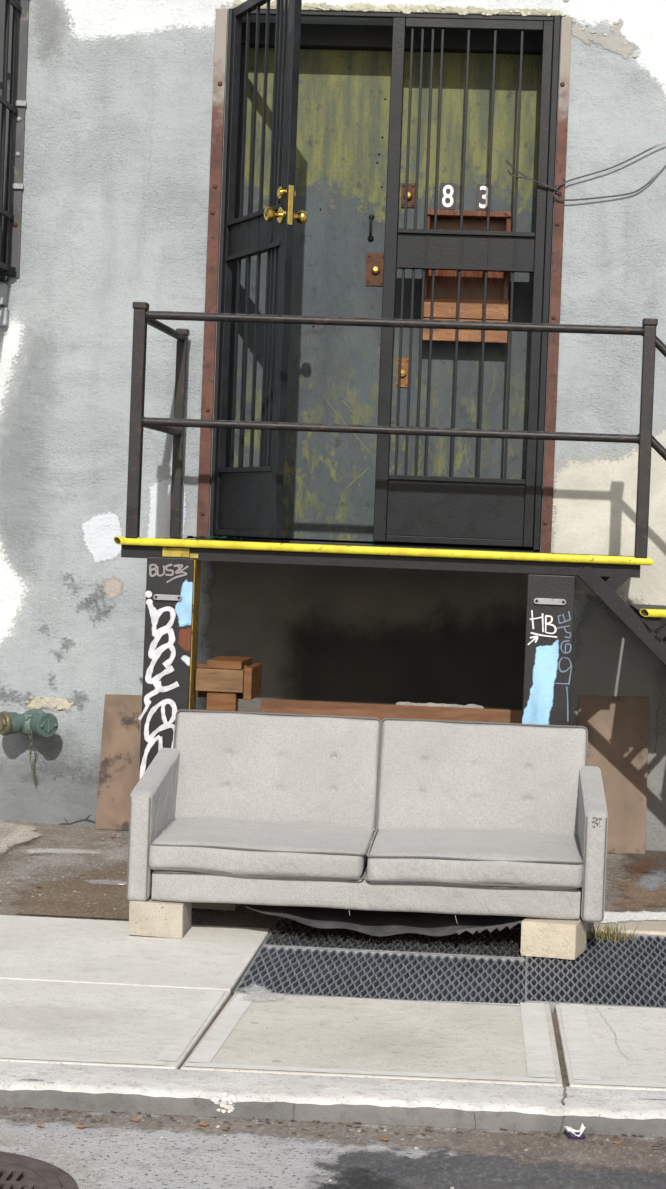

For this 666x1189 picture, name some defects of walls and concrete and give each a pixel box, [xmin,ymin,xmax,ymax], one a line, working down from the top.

flaking render [301,2,638,59]